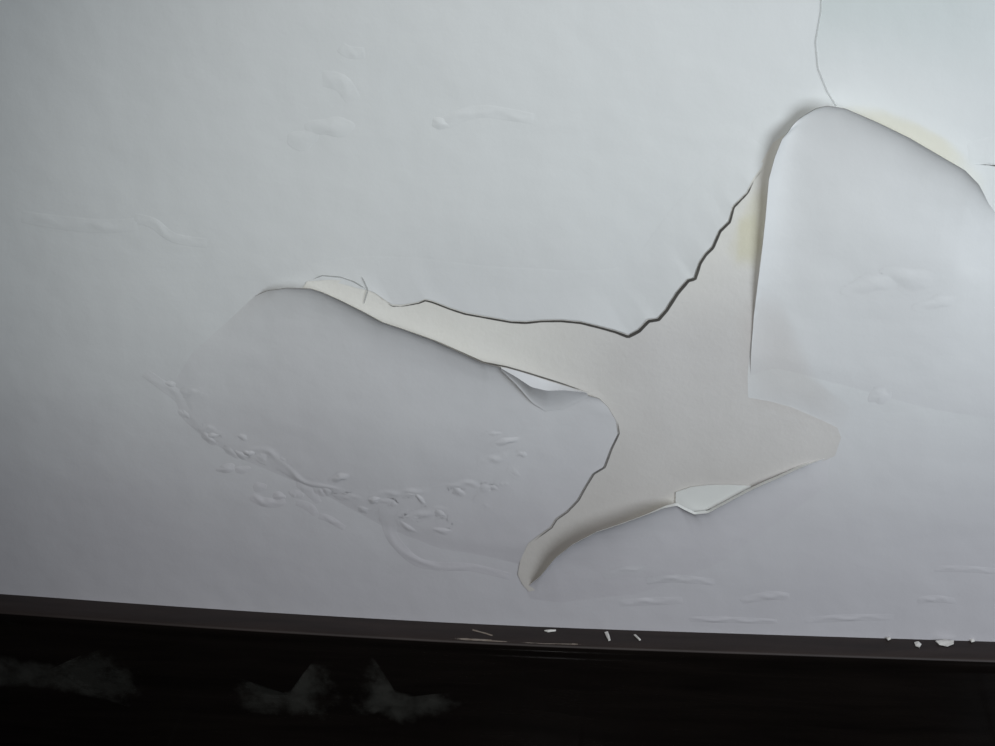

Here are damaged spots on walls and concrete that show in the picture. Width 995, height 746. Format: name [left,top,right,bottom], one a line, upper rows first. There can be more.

peeling [175,134,841,603]